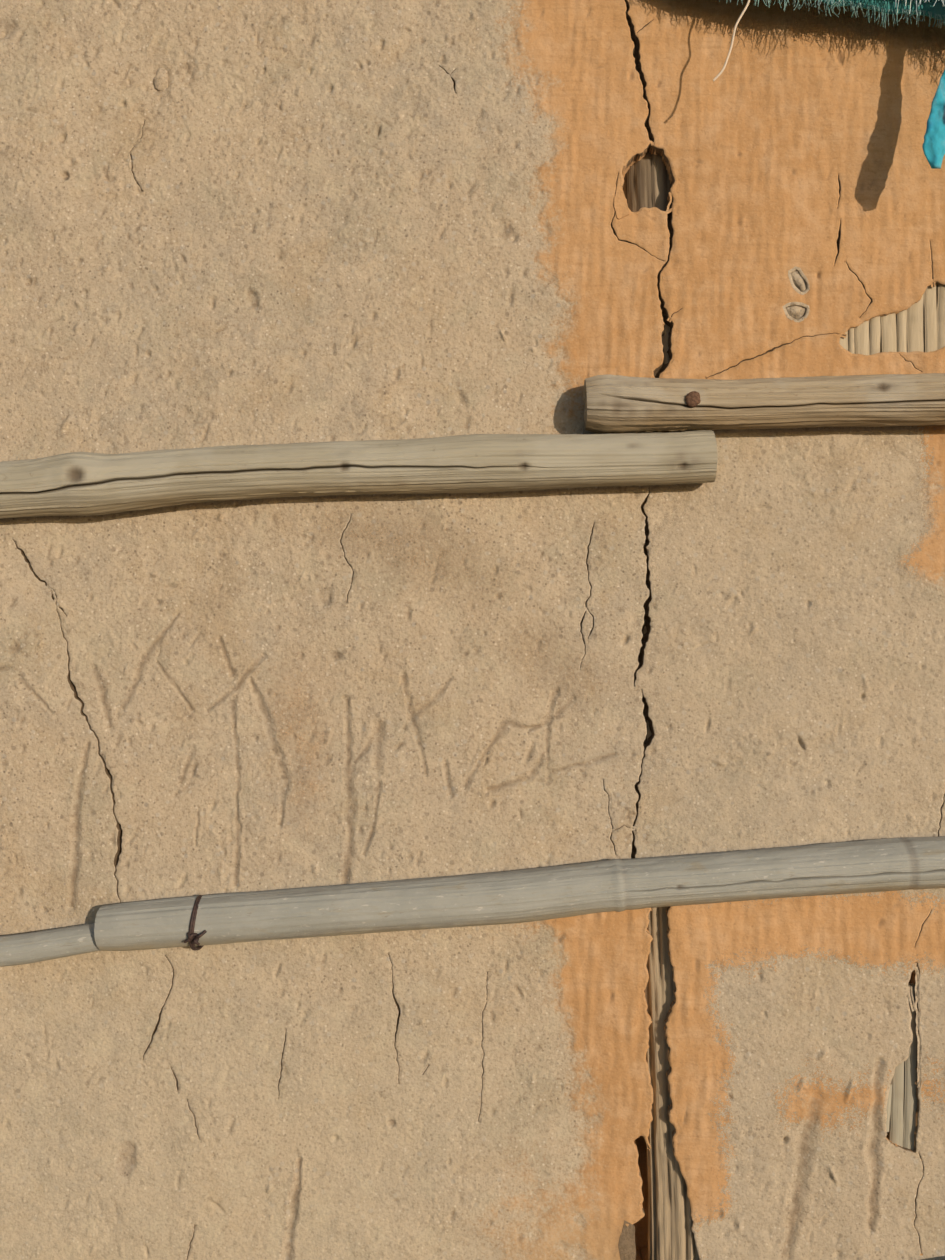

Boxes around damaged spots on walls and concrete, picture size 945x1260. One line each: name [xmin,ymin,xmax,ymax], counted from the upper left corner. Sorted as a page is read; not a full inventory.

crack [623,0,656,146]
spalling [614,141,678,219]
crack [609,172,684,378]
peeling [782,266,810,322]
spalling [836,279,945,359]
crack [11,538,124,904]
crack [601,485,657,859]
peeling [640,426,945,857]
crack [936,750,945,837]
peeling [730,888,945,913]
peeling [694,945,945,1260]